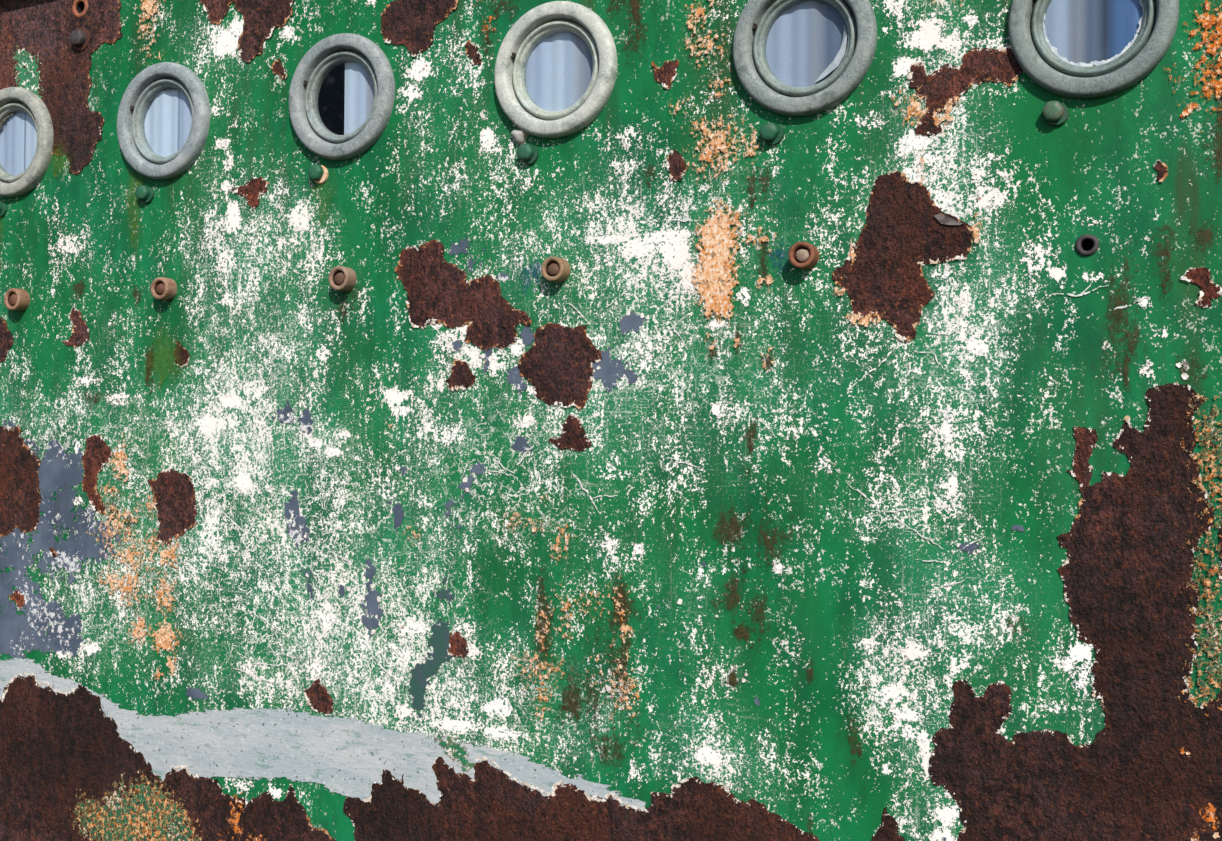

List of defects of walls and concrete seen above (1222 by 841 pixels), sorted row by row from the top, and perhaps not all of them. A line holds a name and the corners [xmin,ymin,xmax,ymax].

corrosion [0,0,166,175]
corrosion [643,0,776,360]
corrosion [832,45,1024,342]
peeling [19,430,83,463]
corrosion [394,239,602,452]
corrosion [82,432,198,680]
corrosion [0,674,336,841]
peeling [0,573,646,811]
corrosion [343,756,819,841]
peeling [675,655,768,793]
peeling [772,560,786,578]
corrosion [928,355,1222,841]